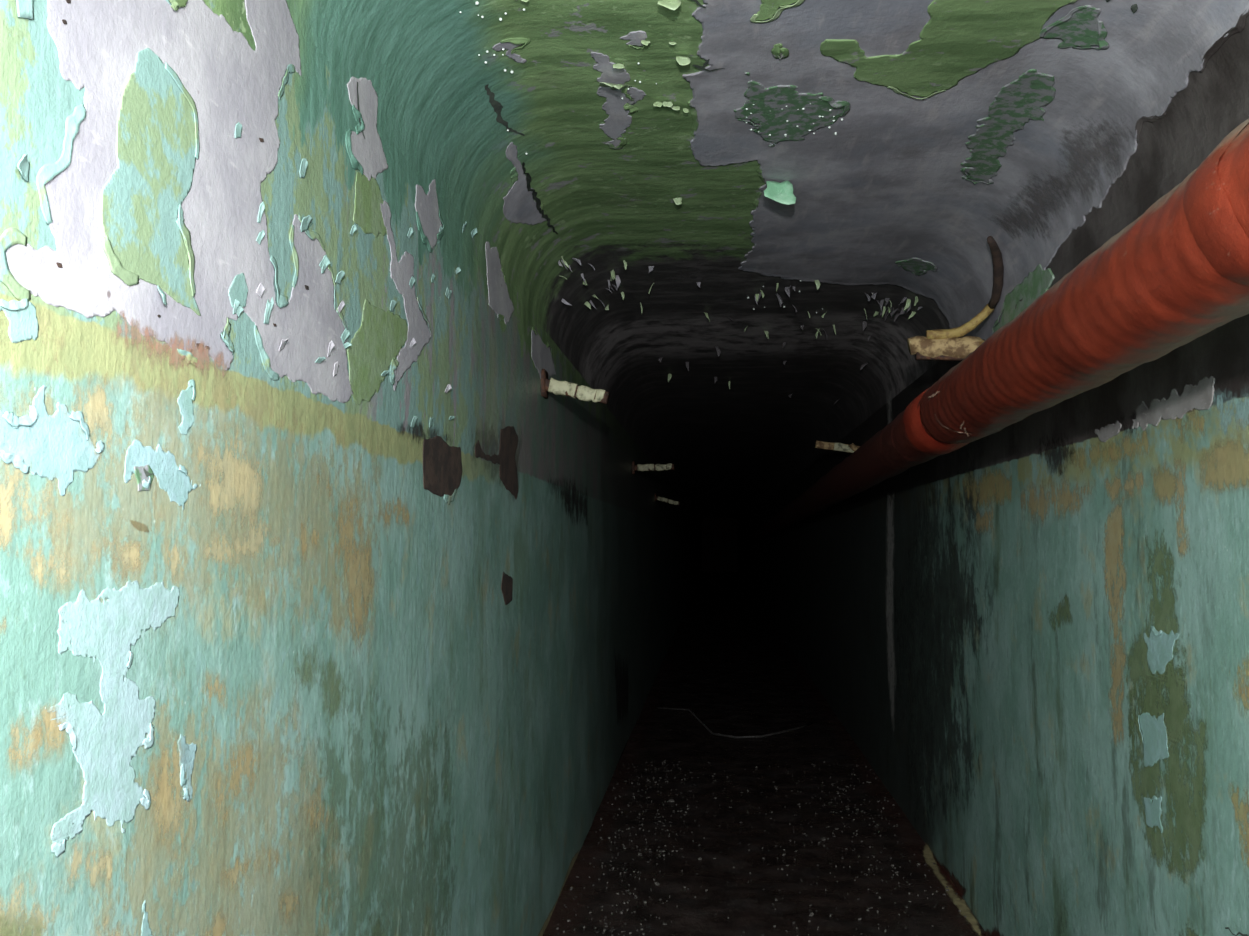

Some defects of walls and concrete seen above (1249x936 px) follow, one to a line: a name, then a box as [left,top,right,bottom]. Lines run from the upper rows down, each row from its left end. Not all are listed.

peeling [492,37,531,63]
crack [485,84,524,136]
peeling [0,0,444,435]
peeling [503,142,558,234]
peeling [590,0,1249,341]
peeling [462,221,514,325]
peeling [558,256,627,310]
peeling [0,385,105,496]
peeling [124,439,201,510]
spalling [400,416,518,505]
peeling [45,580,180,858]